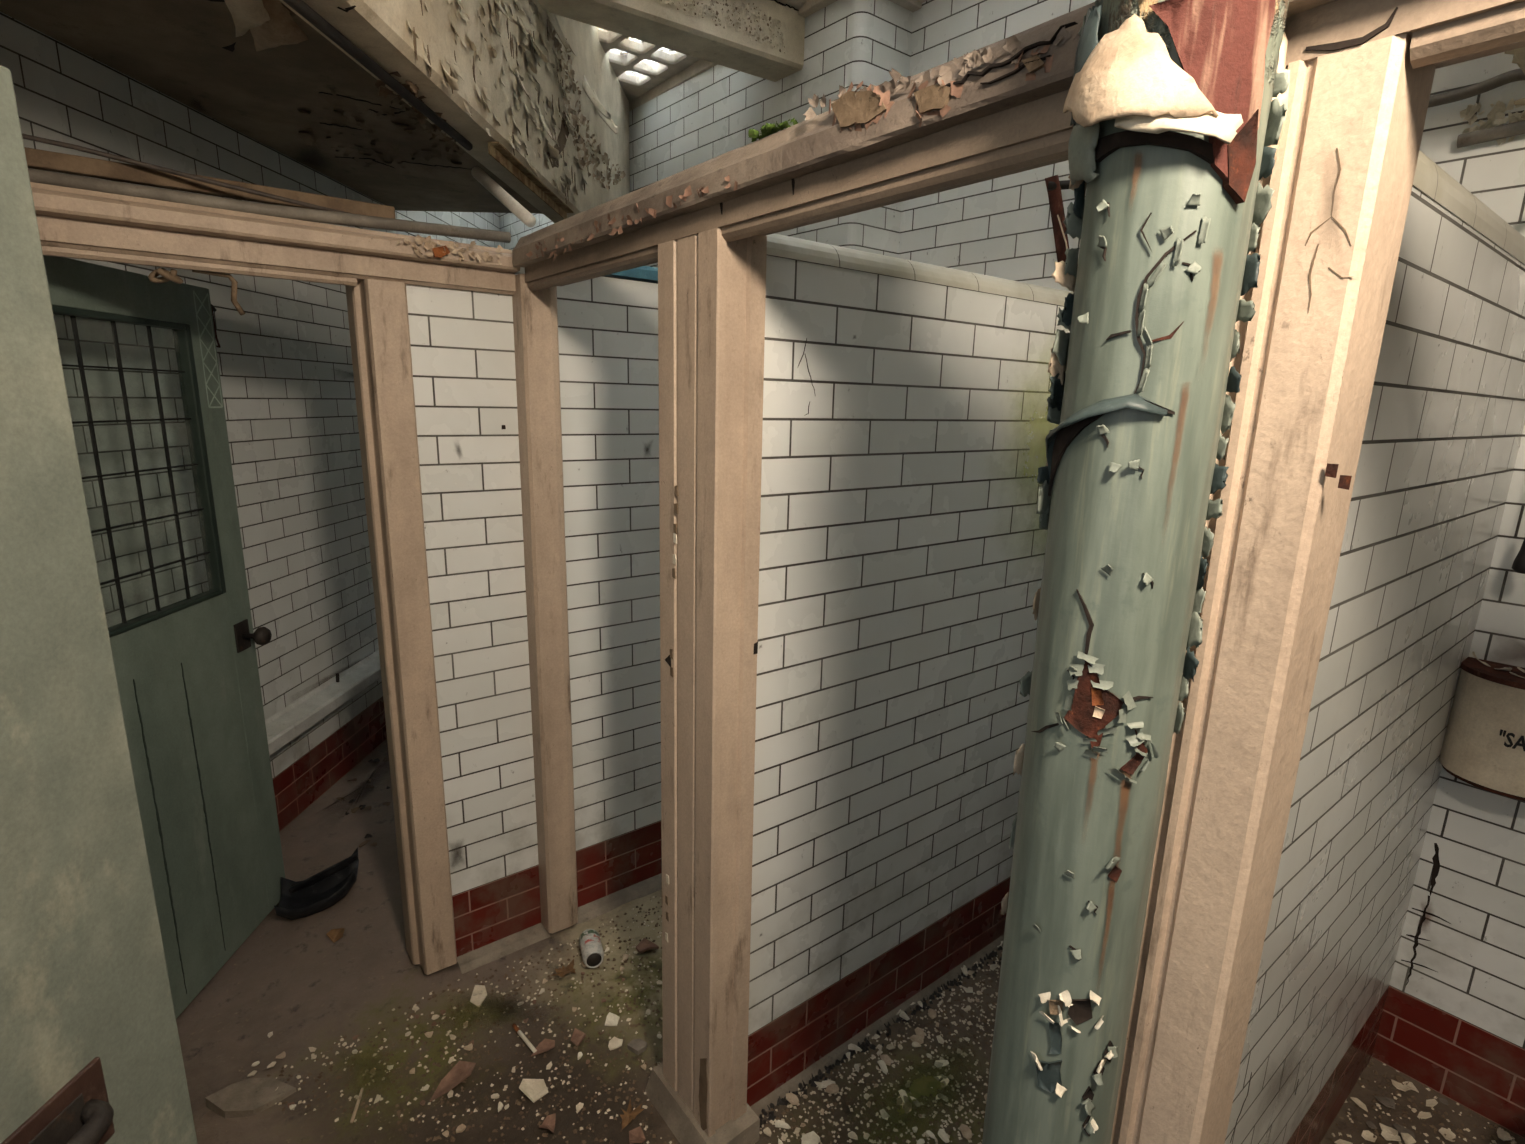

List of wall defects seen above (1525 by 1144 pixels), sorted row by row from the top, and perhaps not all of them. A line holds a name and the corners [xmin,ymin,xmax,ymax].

peeling [222,0,308,52]
peeling [407,0,626,204]
peeling [829,76,964,132]
peeling [1014,45,1054,81]
peeling [526,175,738,261]
crack [1106,213,1211,394]
peeling [1036,0,1290,734]
peeling [1013,588,1159,812]
crack [1401,843,1451,985]
peeling [1030,990,1119,1136]